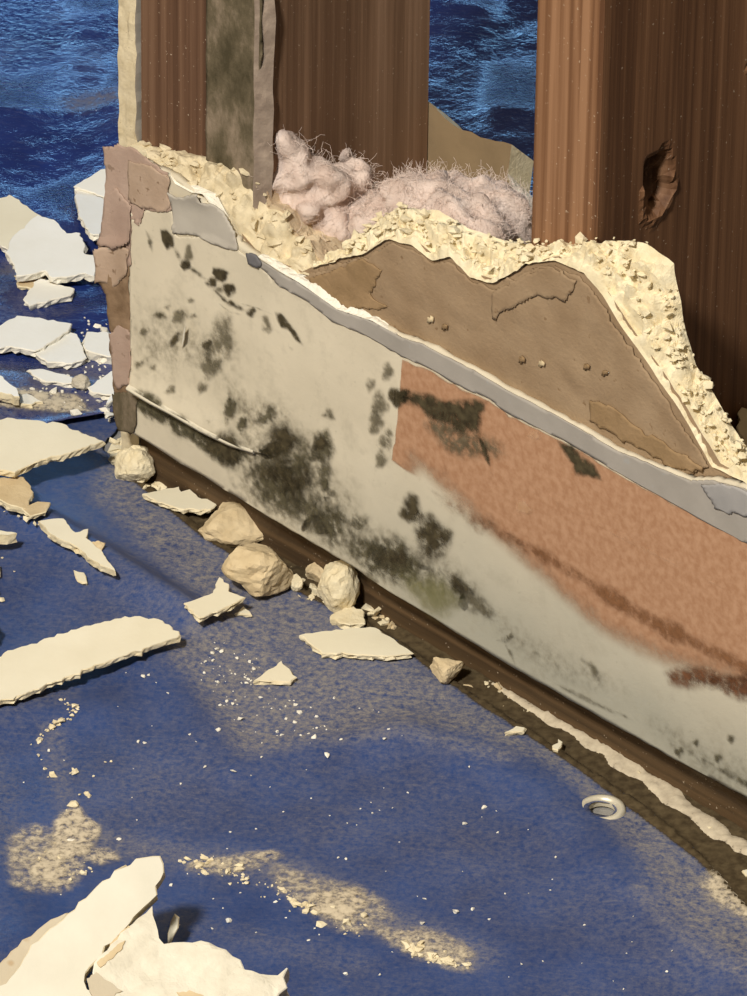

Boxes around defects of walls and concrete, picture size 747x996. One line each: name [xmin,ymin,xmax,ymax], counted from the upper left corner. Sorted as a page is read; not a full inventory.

leakage [198,320,231,392]
leakage [148,230,300,347]
peeling [139,141,747,543]
leakage [136,392,489,615]
leakage [367,360,747,685]